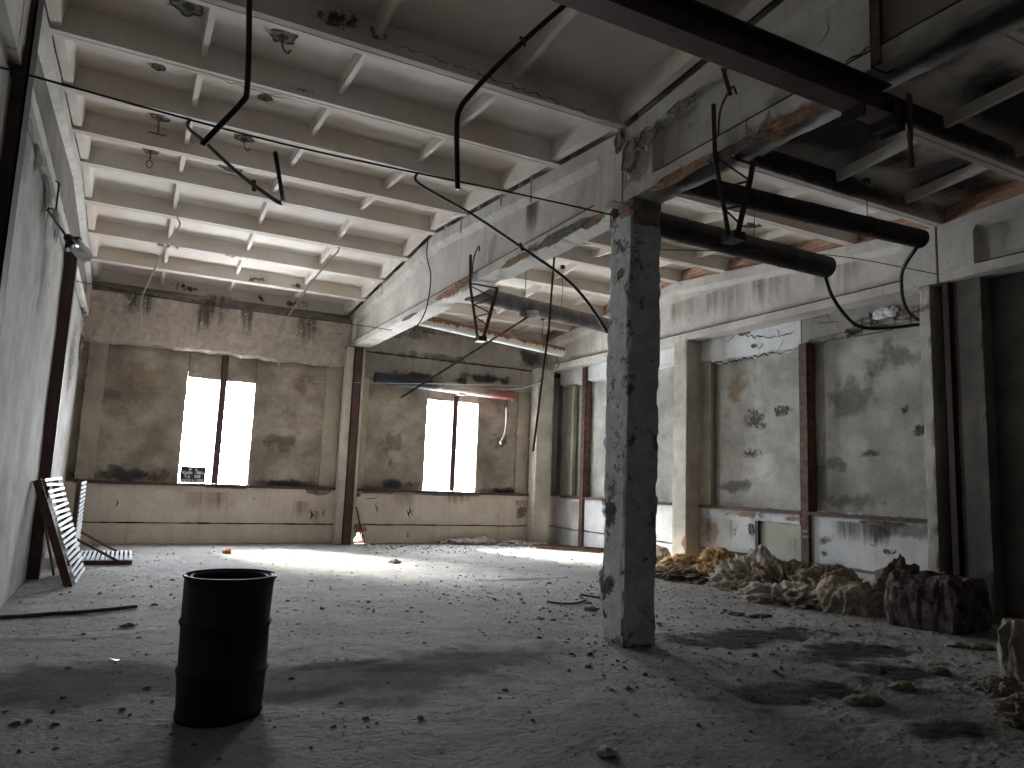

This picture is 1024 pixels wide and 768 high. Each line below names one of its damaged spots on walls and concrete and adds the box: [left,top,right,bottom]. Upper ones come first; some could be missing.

peeling [315,10,387,40]
flaking render [614,94,697,180]
spalling [651,102,823,190]
damp [198,295,231,325]
crack [712,314,838,364]
spalling [808,307,920,342]
spalling [744,405,792,430]
damp [102,465,168,481]
damp [840,522,897,540]
flaking render [598,547,615,618]